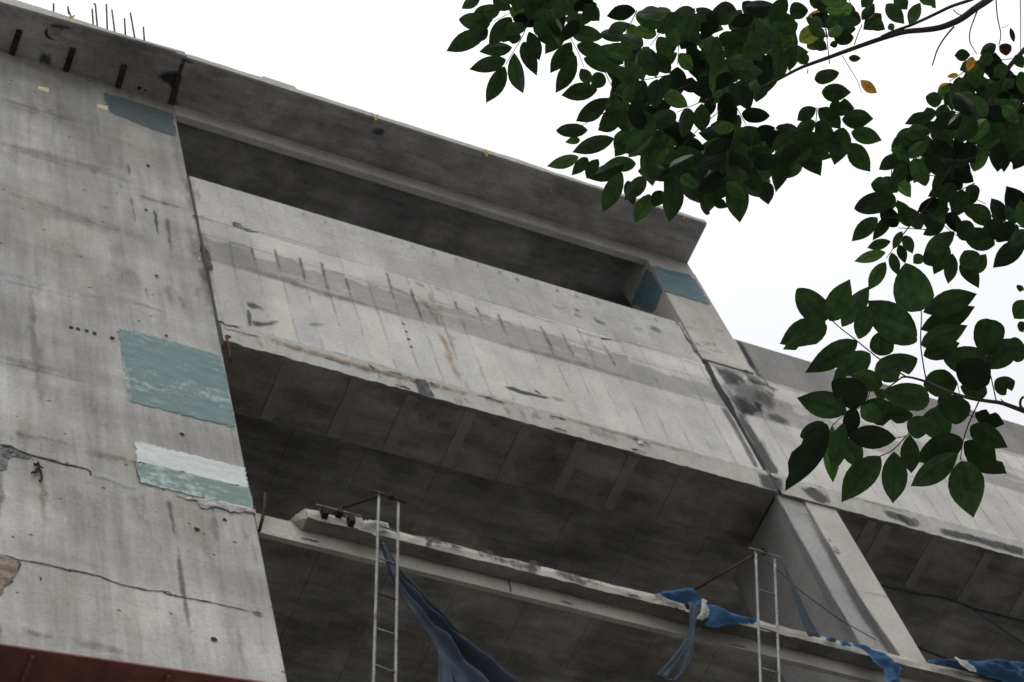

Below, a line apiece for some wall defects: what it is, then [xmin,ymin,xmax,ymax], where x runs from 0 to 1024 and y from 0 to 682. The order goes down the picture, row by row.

rust [279,341,416,382]
water stain [704,341,789,490]
spalling [0,446,30,470]
crack [0,437,92,475]
spalling [0,555,21,594]
crack [1,552,263,617]